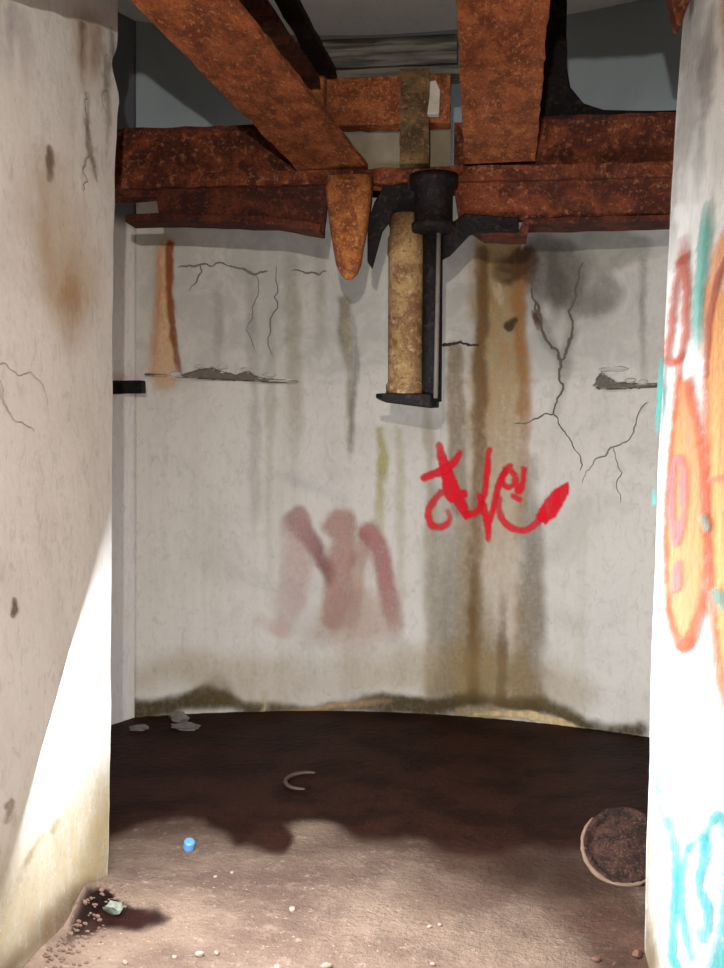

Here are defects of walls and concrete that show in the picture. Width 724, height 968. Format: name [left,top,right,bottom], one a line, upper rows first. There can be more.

rust [154,239,180,380]
crack [178,262,326,356]
rust [473,240,541,461]
crack [515,263,649,502]